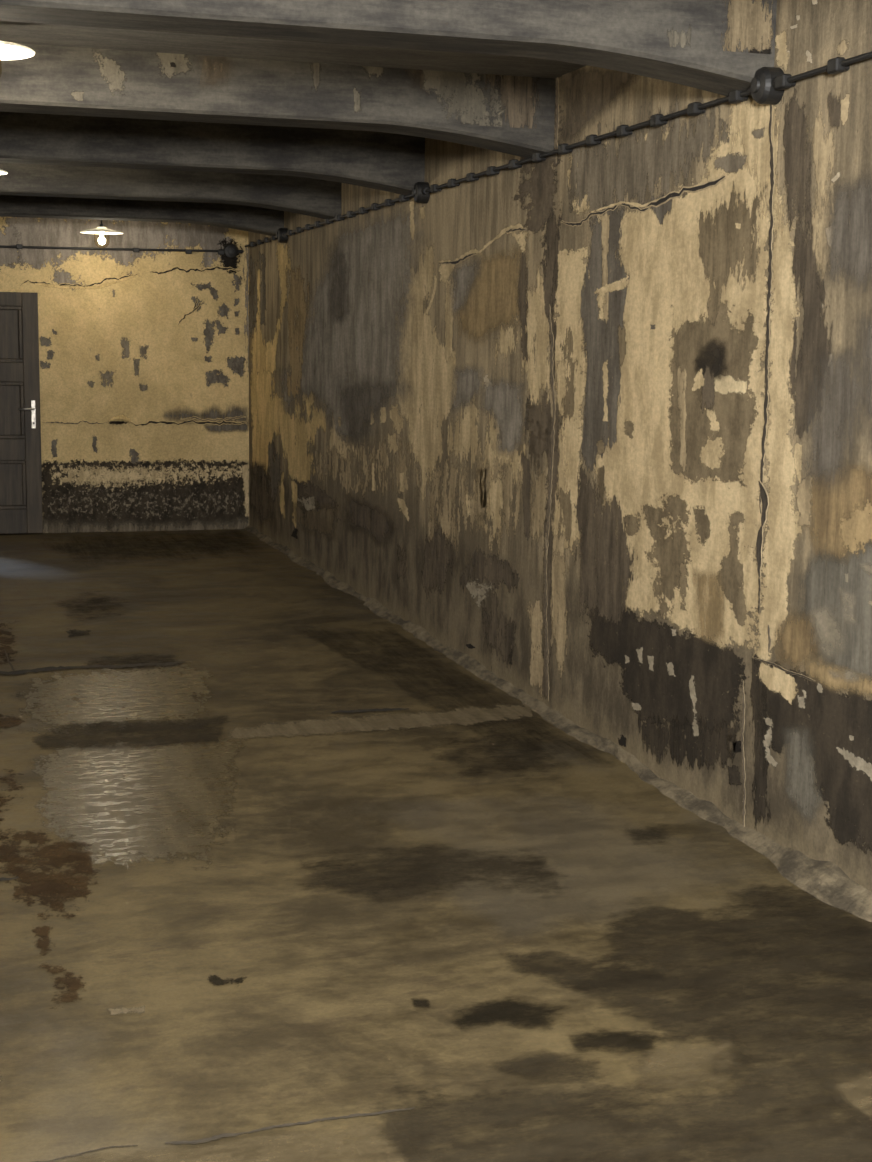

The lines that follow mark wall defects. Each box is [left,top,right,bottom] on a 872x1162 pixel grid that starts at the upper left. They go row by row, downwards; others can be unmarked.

peeling [775,15,800,73]
crack [20,266,241,326]
peeling [121,337,150,391]
damp [232,248,266,377]
damp [282,210,412,443]
crack [439,223,529,265]
peeling [191,95,813,699]
crack [560,174,726,227]
peeling [805,94,850,281]
damp [42,440,407,581]
crack [0,649,186,675]
damp [380,886,872,1162]